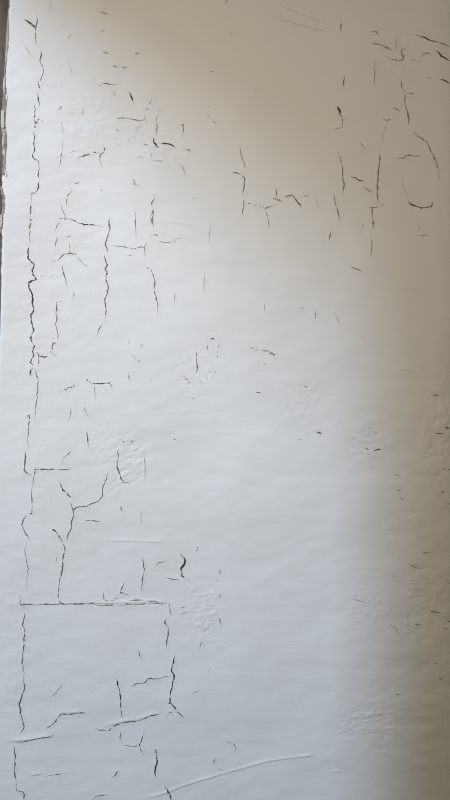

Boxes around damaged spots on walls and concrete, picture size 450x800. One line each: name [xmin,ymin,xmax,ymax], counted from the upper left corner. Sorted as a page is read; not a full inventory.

crack [7,0,225,800]
crack [227,27,450,277]